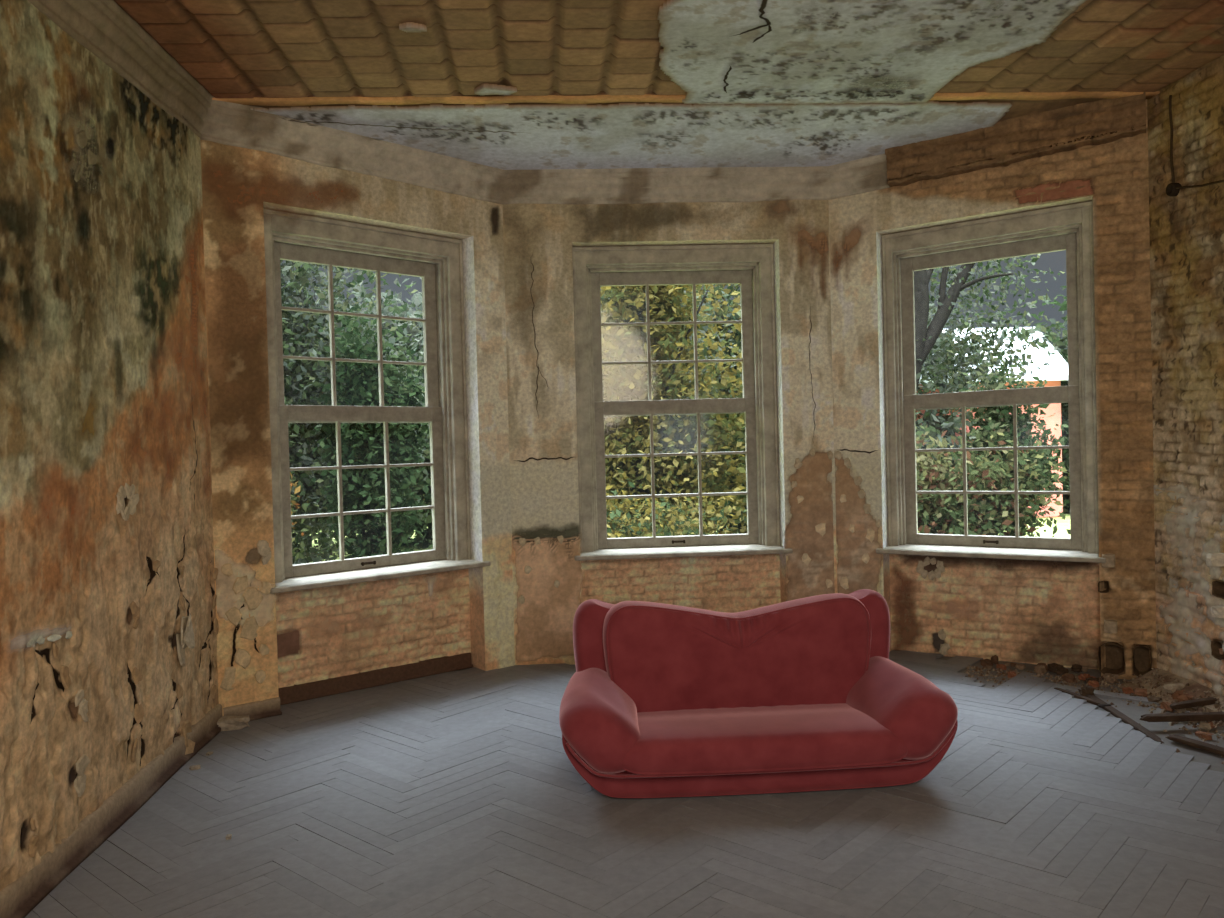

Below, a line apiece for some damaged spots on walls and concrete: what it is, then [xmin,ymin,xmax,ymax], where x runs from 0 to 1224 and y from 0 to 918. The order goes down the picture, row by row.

crack [729,0,772,43]
leakage [120,79,187,151]
flaking render [251,0,1086,170]
crack [723,66,732,93]
leakage [491,208,499,234]
flaking render [1014,179,1094,204]
leakage [135,236,206,430]
leakage [514,524,580,543]
flaking render [784,448,883,601]
crack [126,385,259,770]
spalling [932,629,951,656]
crack [30,642,72,724]